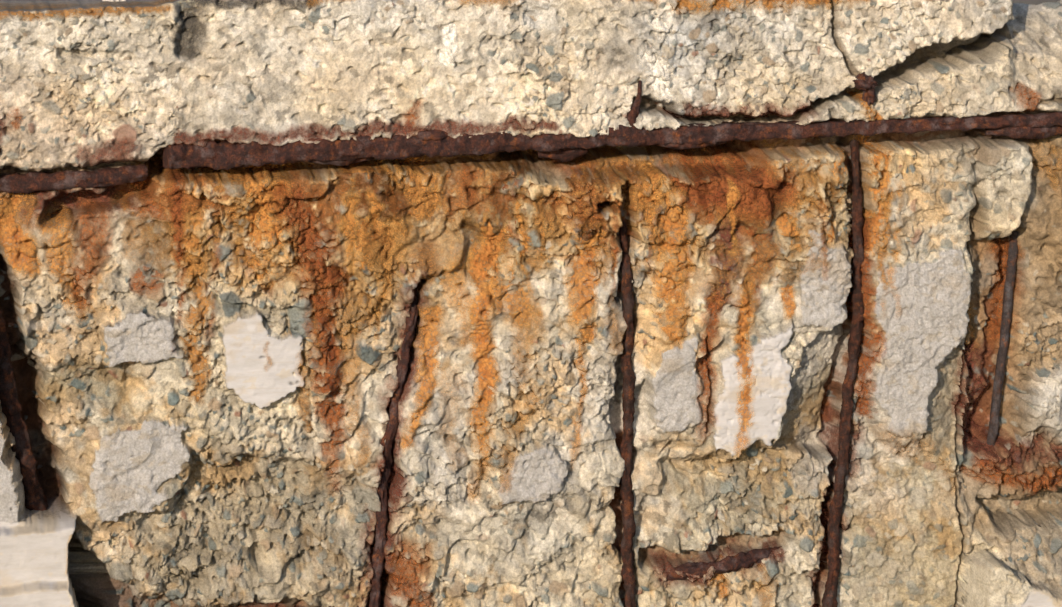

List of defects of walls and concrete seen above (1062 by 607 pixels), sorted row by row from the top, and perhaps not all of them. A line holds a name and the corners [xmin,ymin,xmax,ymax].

rust [174,100,558,146]
spalling [0,0,1062,175]
rust [663,103,813,117]
crack [663,0,1013,126]
rust [846,91,884,120]
rust [985,83,1062,139]
crack [1038,95,1062,107]
rust [0,139,848,607]
spalling [0,128,1062,607]
rust [821,134,901,556]
rust [951,237,1062,494]